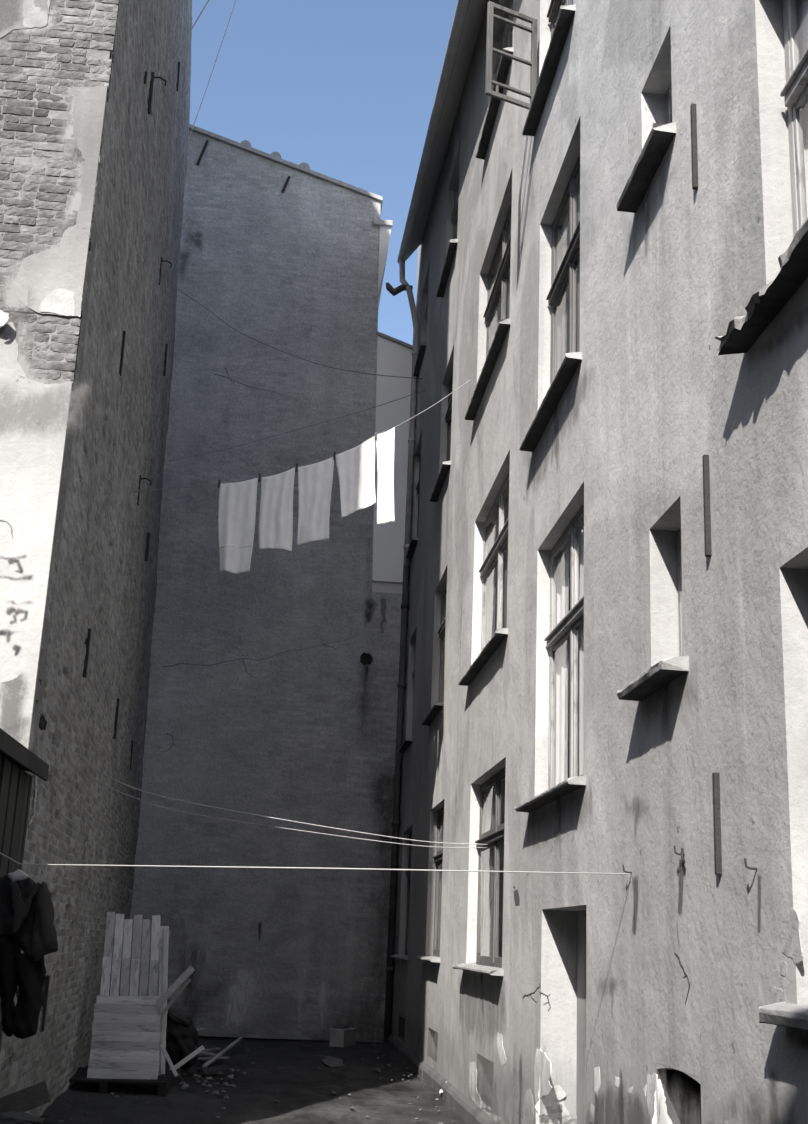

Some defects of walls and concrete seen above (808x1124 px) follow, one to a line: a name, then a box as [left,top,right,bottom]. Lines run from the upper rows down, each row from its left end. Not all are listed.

flaking render [0,0,120,391]
crack [162,598,387,678]
crack [523,983,551,1011]
crack [675,953,690,1004]
flaking render [497,1032,507,1065]
flaking render [469,1049,601,1124]
flaking render [615,1073,672,1124]